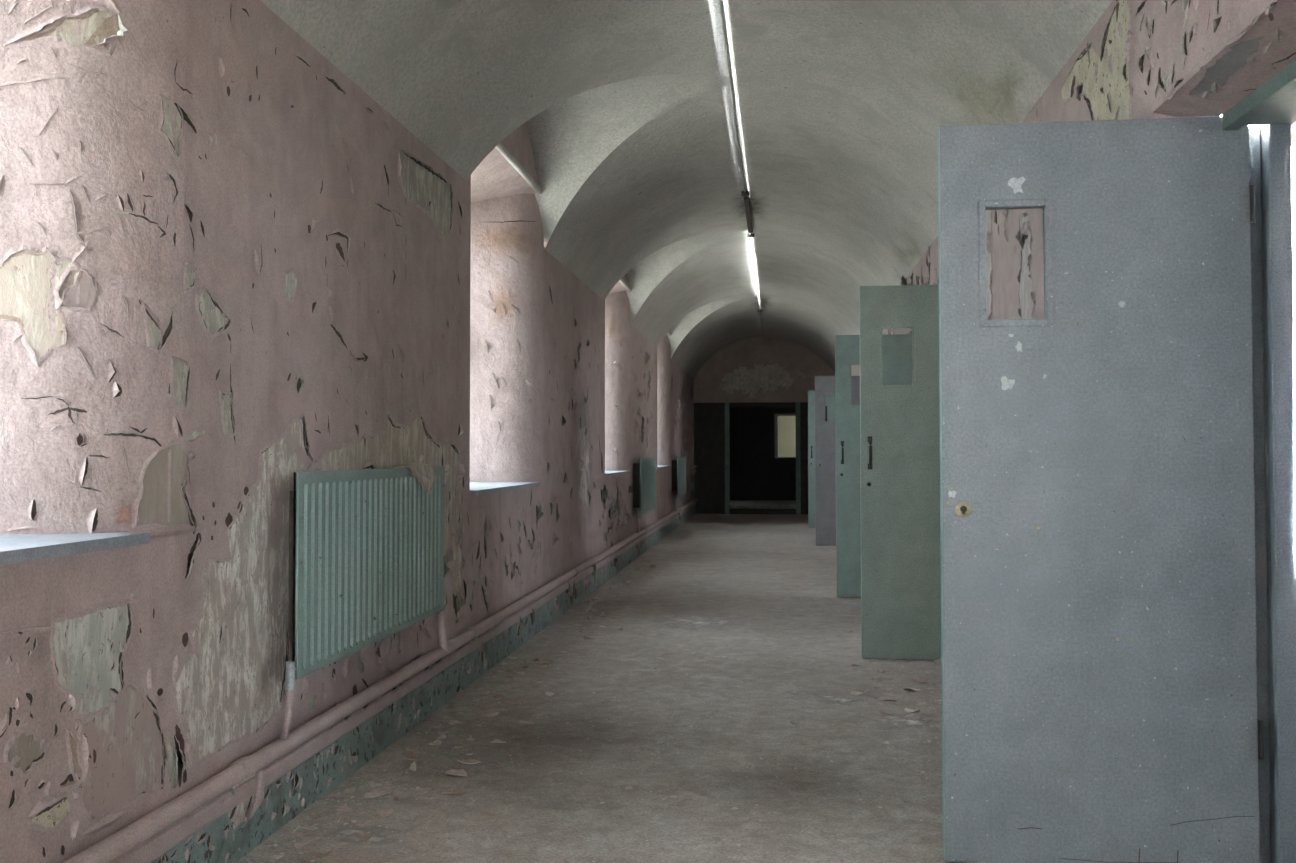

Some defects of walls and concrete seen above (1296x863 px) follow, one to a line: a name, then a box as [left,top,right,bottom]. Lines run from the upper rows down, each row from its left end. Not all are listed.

peeling [4,0,128,57]
peeling [1060,0,1284,121]
peeling [158,94,197,223]
peeling [0,243,98,368]
peeling [195,284,231,342]
peeling [900,246,939,285]
flaking render [0,299,645,863]